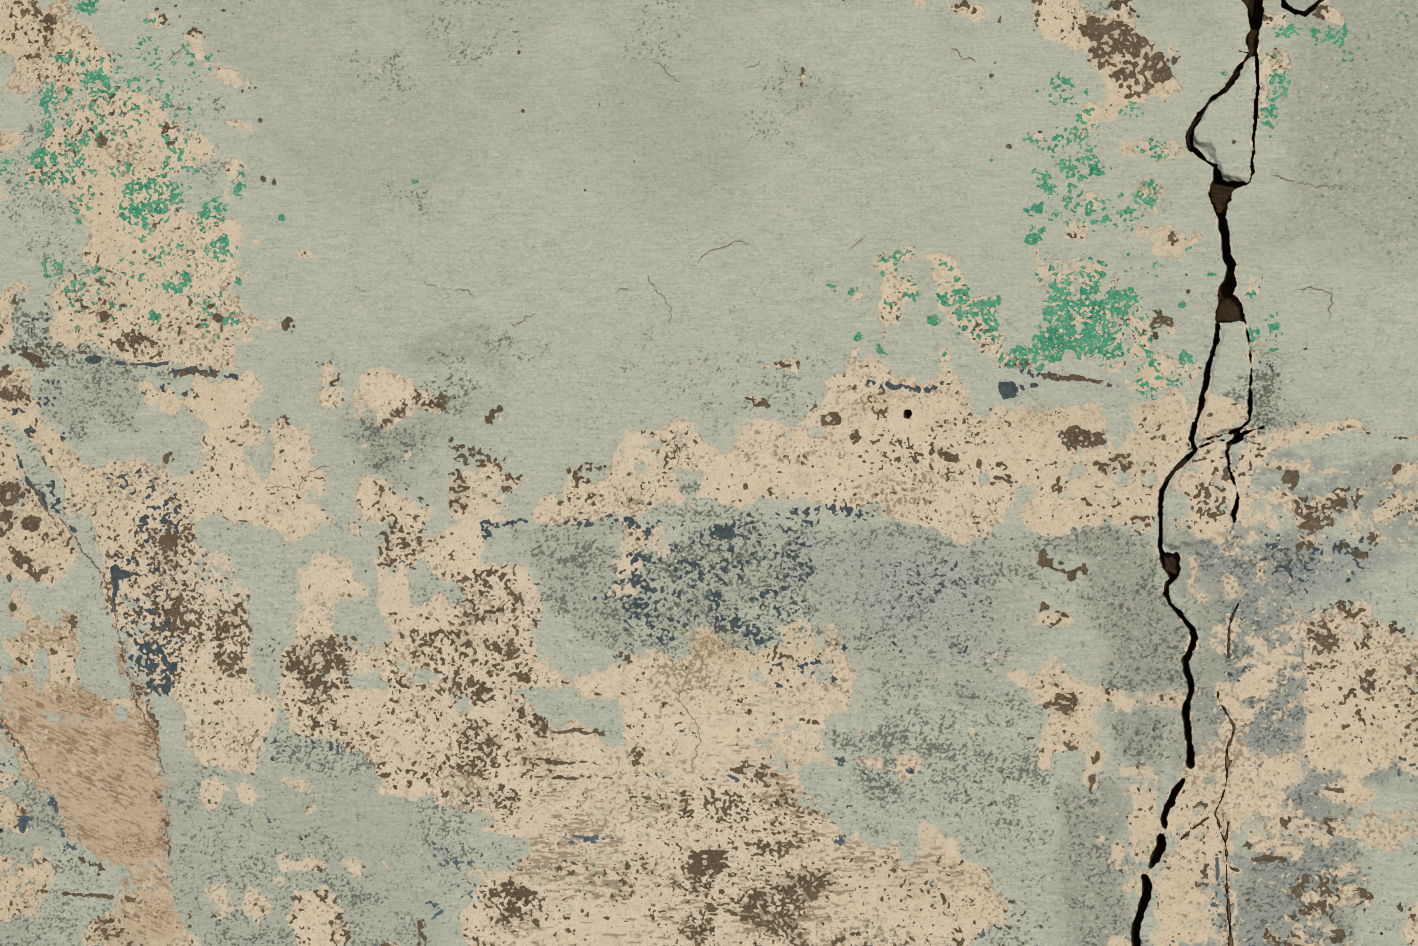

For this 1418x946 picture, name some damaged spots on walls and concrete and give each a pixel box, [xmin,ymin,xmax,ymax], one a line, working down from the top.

peeling [760,348,800,375]
peeling [484,405,503,425]
crack [1133,0,1339,946]
peeling [964,727,1017,813]
peeling [282,777,317,815]
peeling [340,851,388,882]
peeling [413,901,444,946]
peeling [1063,897,1135,946]